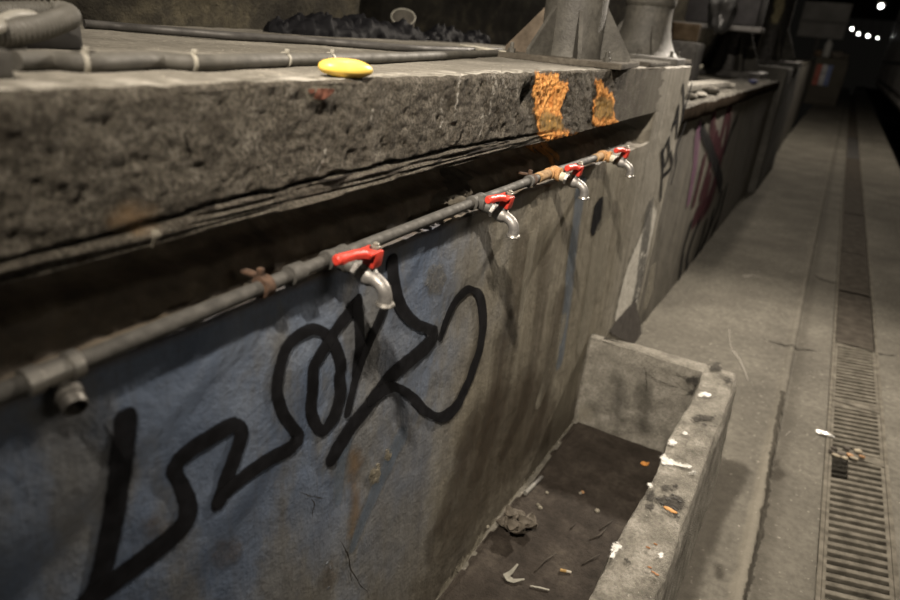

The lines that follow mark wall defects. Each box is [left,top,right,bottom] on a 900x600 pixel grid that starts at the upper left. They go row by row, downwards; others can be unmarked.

corrosion [526,72,578,183]
corrosion [592,79,619,127]
leakage [578,162,616,352]